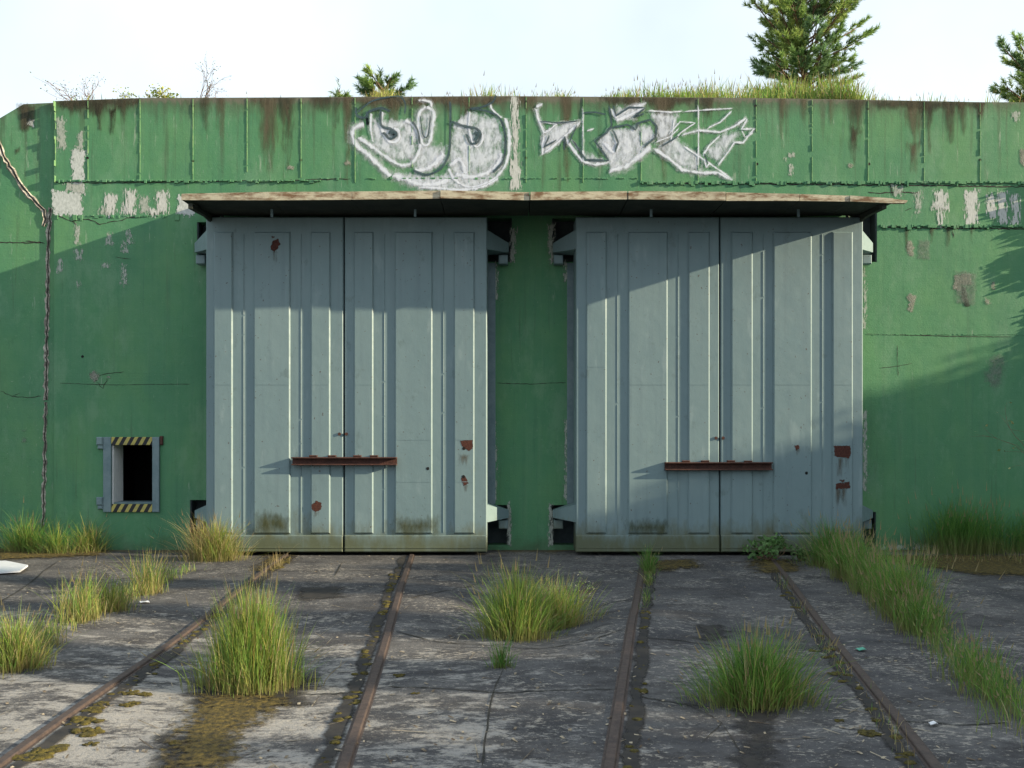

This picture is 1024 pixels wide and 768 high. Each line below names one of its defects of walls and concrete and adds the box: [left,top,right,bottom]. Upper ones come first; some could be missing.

damp [60,98,138,127]
damp [279,98,292,136]
damp [314,97,338,106]
damp [849,100,985,145]
peeling [51,116,88,261]
peeling [97,189,195,218]
peeling [891,184,950,228]
peeling [964,188,1022,228]
crack [0,142,246,526]
corrosion [834,445,851,467]
corrosion [836,479,850,497]